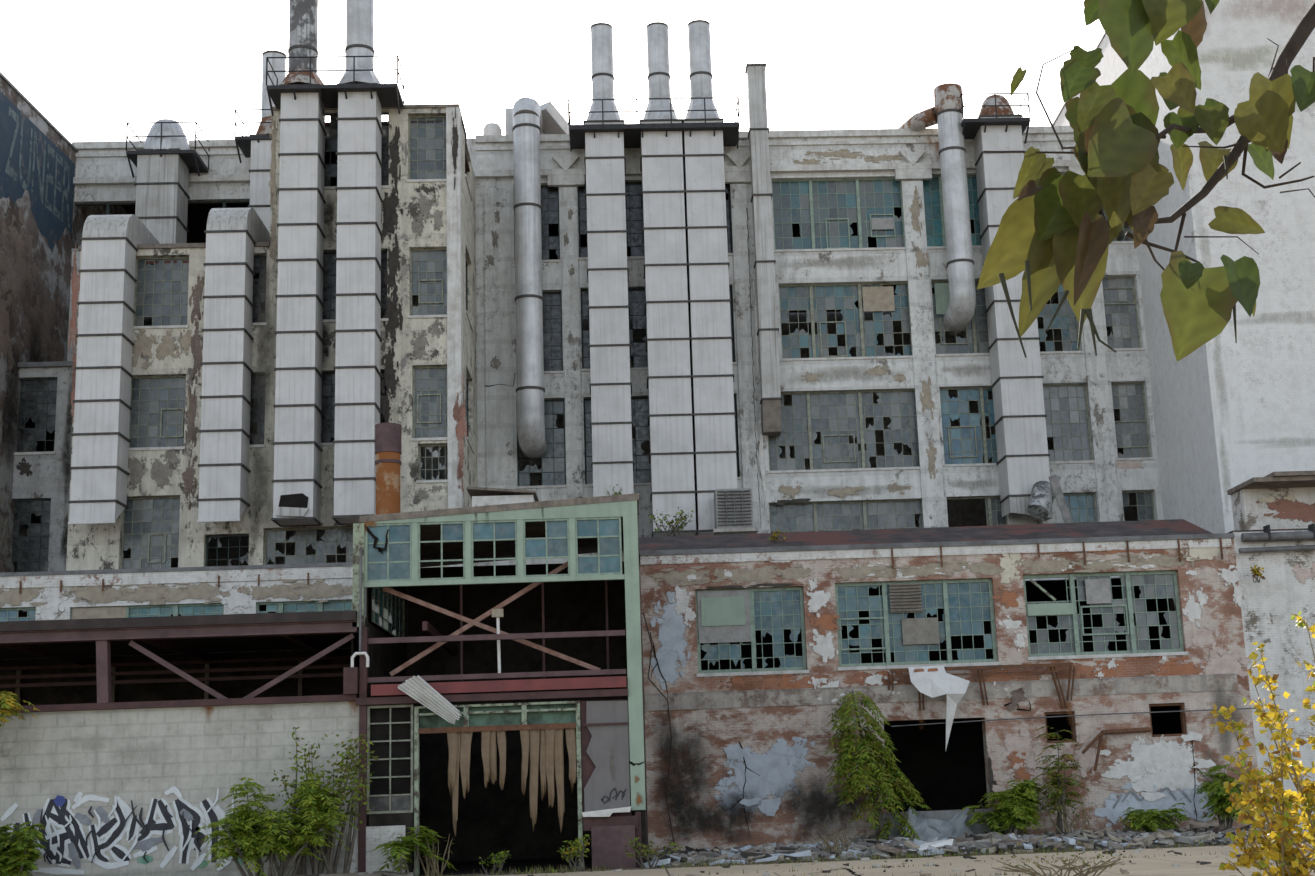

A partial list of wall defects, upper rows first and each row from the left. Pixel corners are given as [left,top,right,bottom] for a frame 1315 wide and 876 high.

leakage [2,331,40,454]
leakage [63,403,72,492]
peeling [1257,495,1315,523]
spalling [0,579,353,620]
spalling [649,547,1251,711]
leakage [660,732,754,841]
peeling [714,737,816,816]
leakage [789,783,861,834]
peeling [987,727,1048,803]
peeling [1075,731,1218,827]